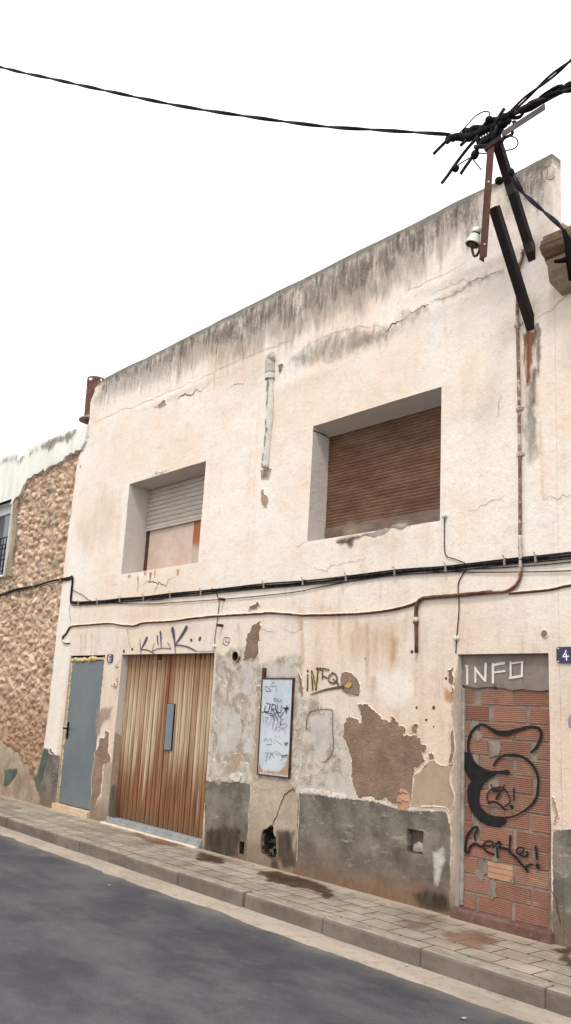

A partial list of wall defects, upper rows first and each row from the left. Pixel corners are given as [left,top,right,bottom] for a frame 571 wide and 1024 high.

damp [102,202,479,389]
crack [83,269,501,451]
corrosion [523,330,536,384]
damp [525,323,541,454]
spalling [260,418,273,508]
spalling [336,523,410,543]
spalling [243,601,262,661]
spalling [89,730,122,816]
spalling [295,671,456,846]
spalling [261,826,277,859]
damp [259,831,333,898]
damp [417,849,447,910]